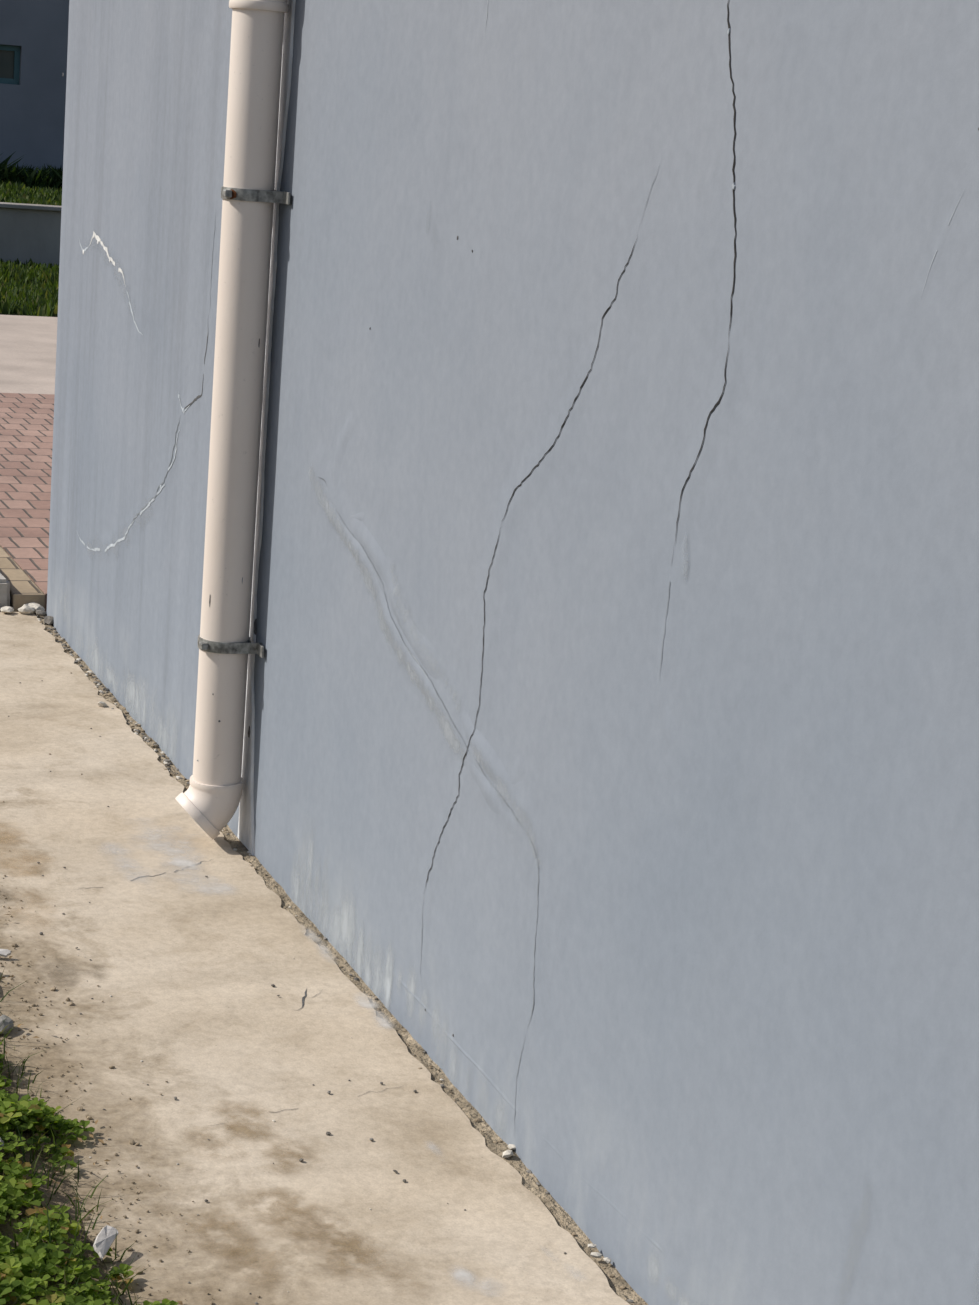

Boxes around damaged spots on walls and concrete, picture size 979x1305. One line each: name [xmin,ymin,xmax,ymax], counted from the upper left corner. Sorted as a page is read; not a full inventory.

crack [78,200,217,566]
crack [416,157,663,984]
crack [655,0,750,781]
crack [514,840,544,1131]